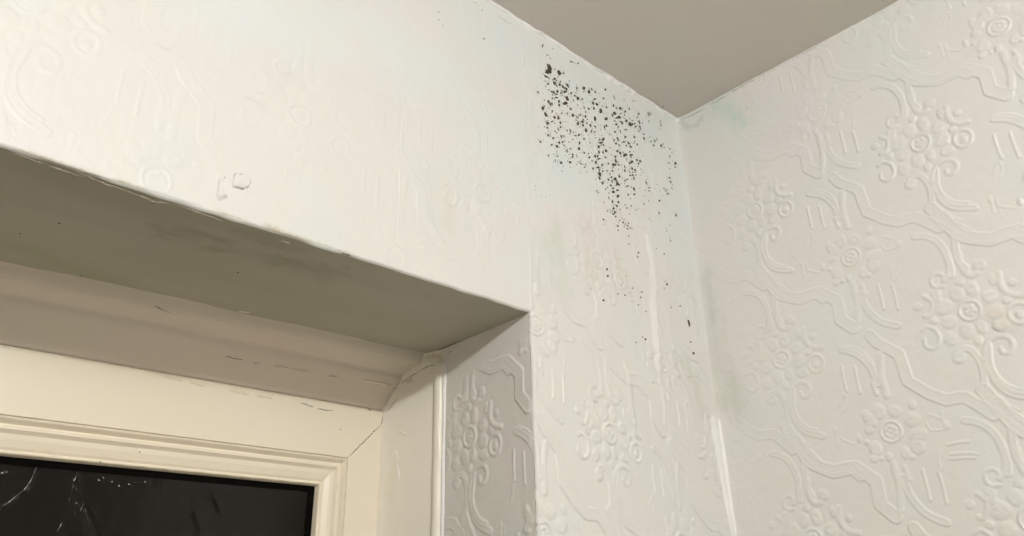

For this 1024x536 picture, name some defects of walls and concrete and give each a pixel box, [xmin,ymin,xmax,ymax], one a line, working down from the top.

damp [438,0,848,429]